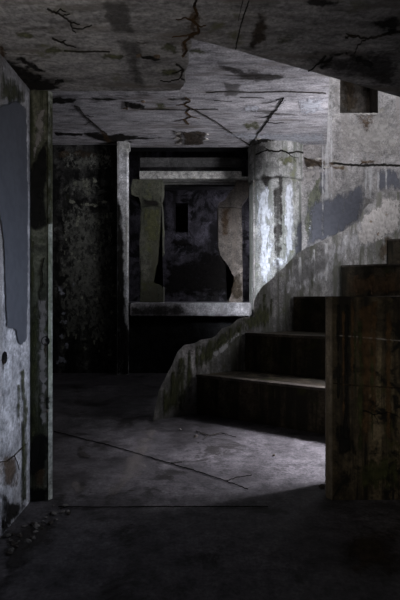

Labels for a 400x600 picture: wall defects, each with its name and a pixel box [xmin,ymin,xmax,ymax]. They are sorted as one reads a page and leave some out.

crack [47,8,110,53]
crack [160,0,206,83]
crack [235,0,249,49]
crack [345,30,400,63]
leakage [55,132,161,170]
spalling [174,131,209,145]
crack [140,91,400,170]
leakage [262,175,283,275]
leakage [282,86,370,293]
peeling [304,157,400,244]
leakage [60,180,184,374]
leakage [163,326,241,415]